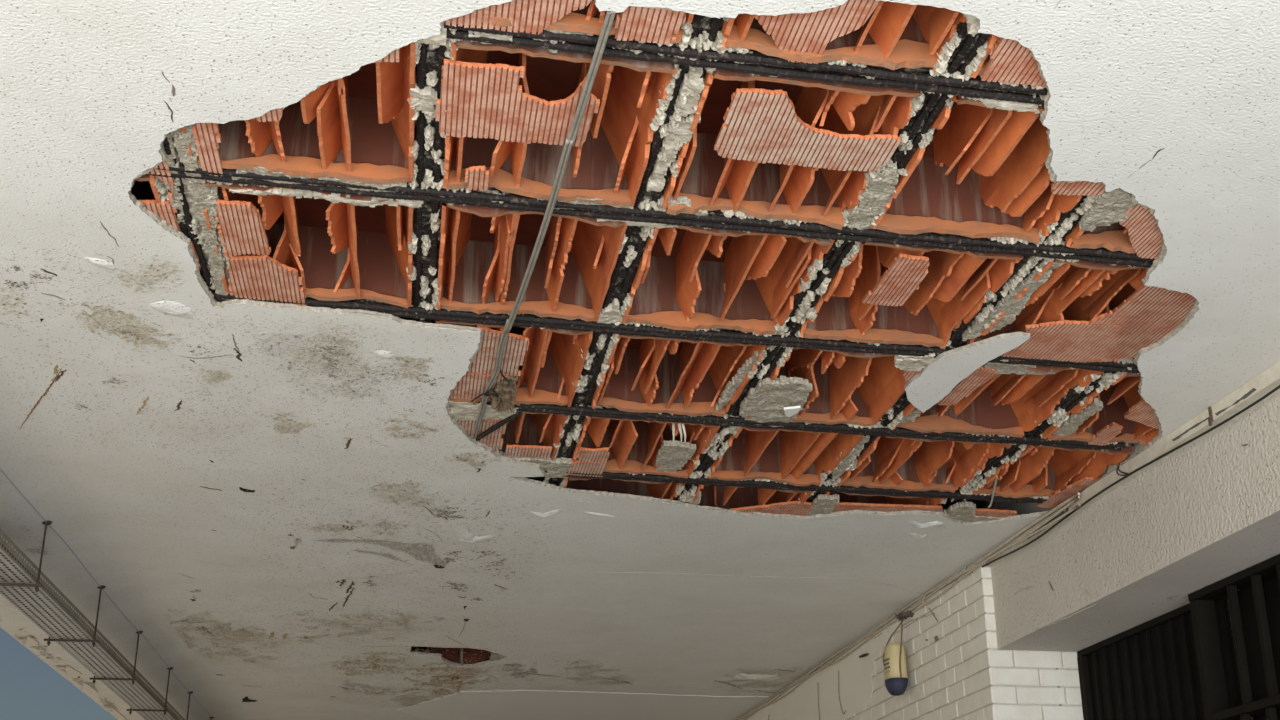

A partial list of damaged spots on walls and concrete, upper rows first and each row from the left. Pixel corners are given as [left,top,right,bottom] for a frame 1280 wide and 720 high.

flaking render [1045,148,1077,183]
flaking render [196,269,308,309]
flaking render [333,309,482,370]
peeling [784,406,801,417]
flaking render [446,399,597,493]
flaking render [1082,378,1257,492]
flaking render [632,495,796,517]
flaking render [824,510,963,523]